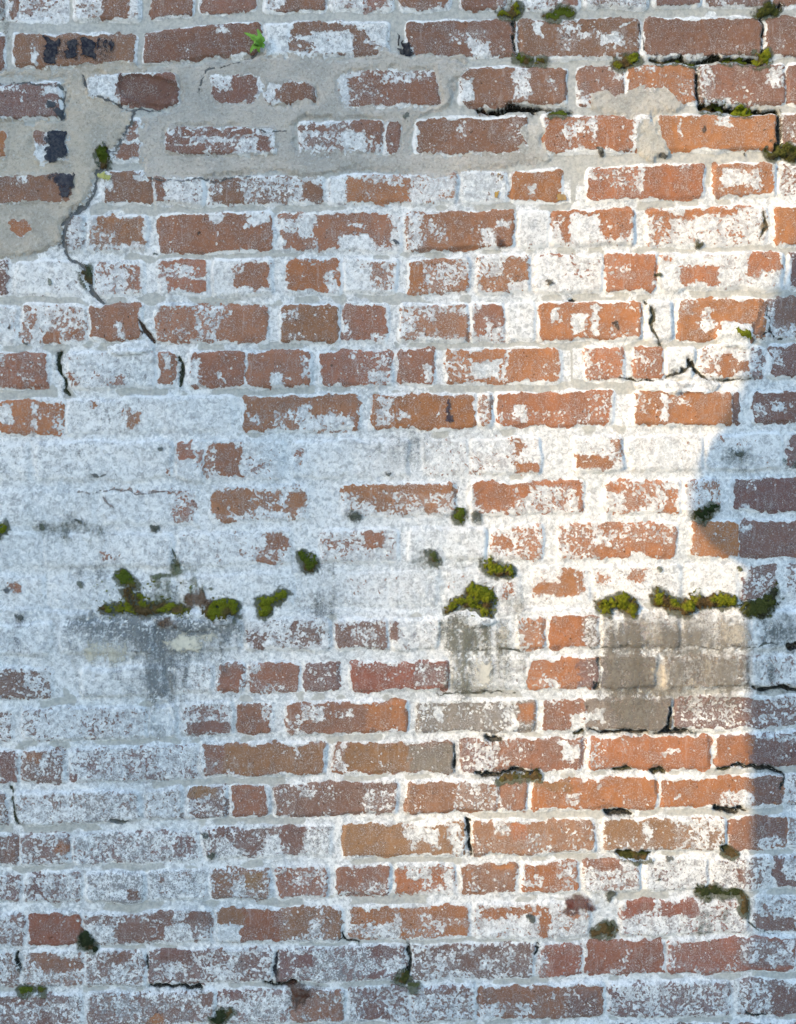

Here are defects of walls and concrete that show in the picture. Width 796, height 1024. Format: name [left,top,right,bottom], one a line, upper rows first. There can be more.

crack [693,70,701,104]
crack [13,75,159,305]
crack [139,319,156,343]
crack [644,301,661,346]
crack [619,358,751,382]
damp [39,515,104,541]
damp [67,611,245,703]
damp [439,614,510,692]
damp [596,613,796,736]
crack [464,817,472,855]
crack [272,952,280,982]